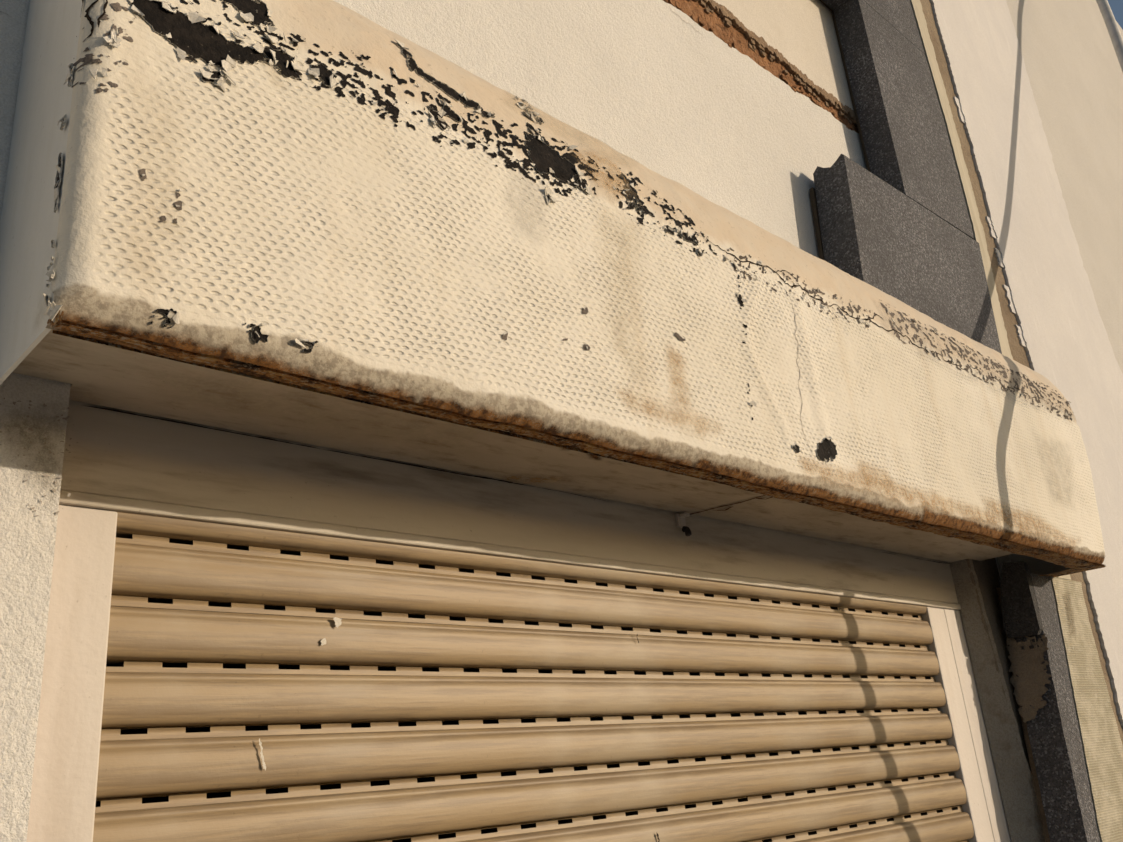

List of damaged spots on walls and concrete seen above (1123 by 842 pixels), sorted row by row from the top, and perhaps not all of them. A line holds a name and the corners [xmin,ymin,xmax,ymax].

peeling [54,152,63,213]
peeling [63,0,1072,421]
spalling [43,240,64,328]
peeling [816,436,837,464]